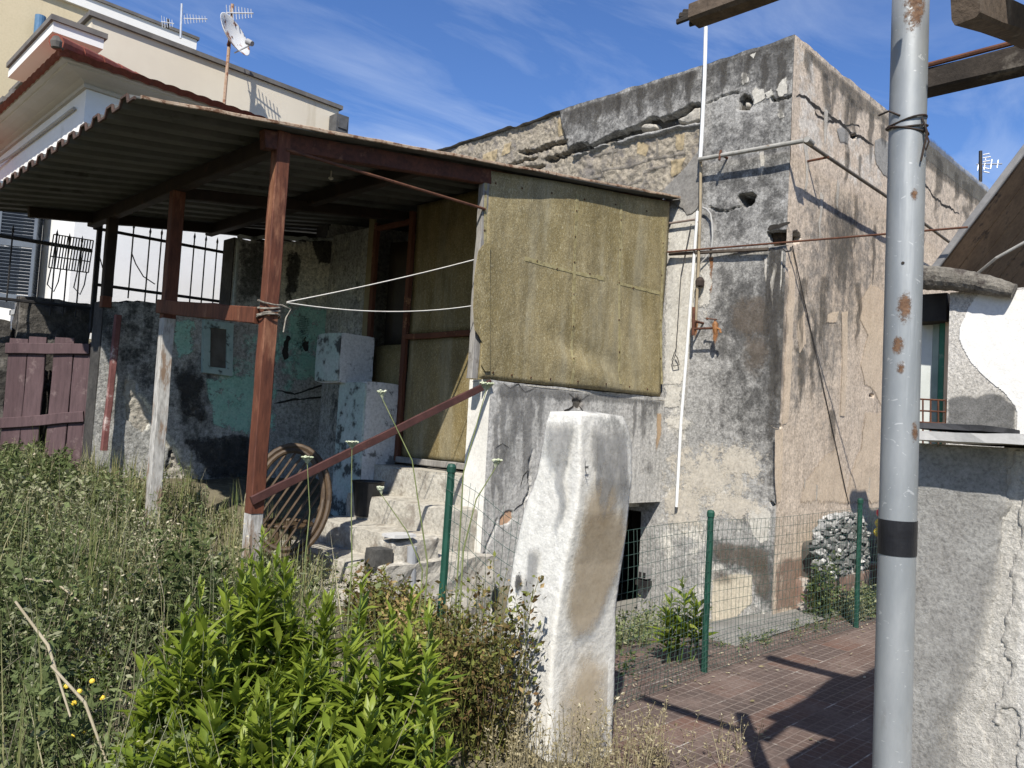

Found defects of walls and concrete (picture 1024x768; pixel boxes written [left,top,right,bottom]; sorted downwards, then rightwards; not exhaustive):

corrosion [904,0,925,31]
peeling [741,72,787,118]
crack [774,94,873,145]
spalling [443,115,700,192]
water stain [285,251,301,303]
corrosion [897,294,911,321]
corrosion [892,337,904,373]
water stain [174,367,205,421]
water stain [185,434,250,479]
crack [496,443,529,510]
water stain [571,428,629,632]
water stain [567,659,604,753]